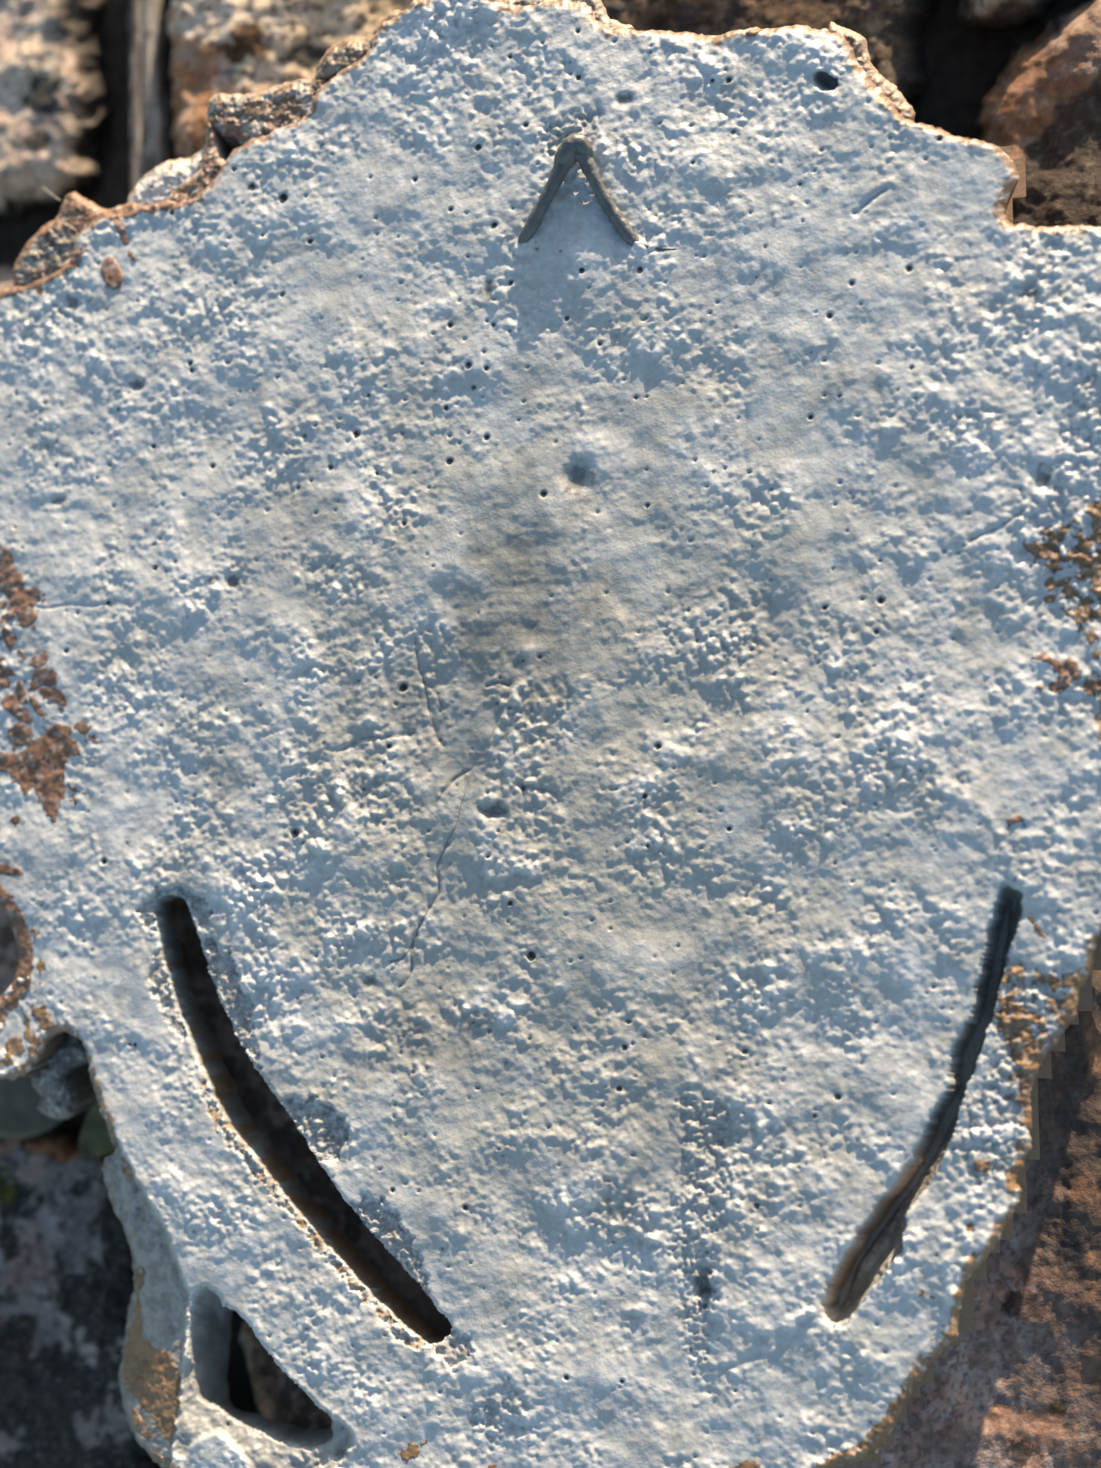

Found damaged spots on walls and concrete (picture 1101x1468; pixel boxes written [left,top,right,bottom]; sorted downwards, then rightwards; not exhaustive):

peeling [0,547,99,823]
peeling [1022,501,1101,705]
crack [390,640,510,987]
peeling [1006,814,1026,829]
peeling [0,864,55,1066]
peeling [1028,915,1047,938]
peeling [120,1157,134,1183]
peeling [969,962,1080,1240]
peeling [119,1266,181,1468]
peeling [396,1439,427,1464]
peeling [729,1460,761,1468]
peeling [815,1300,960,1468]